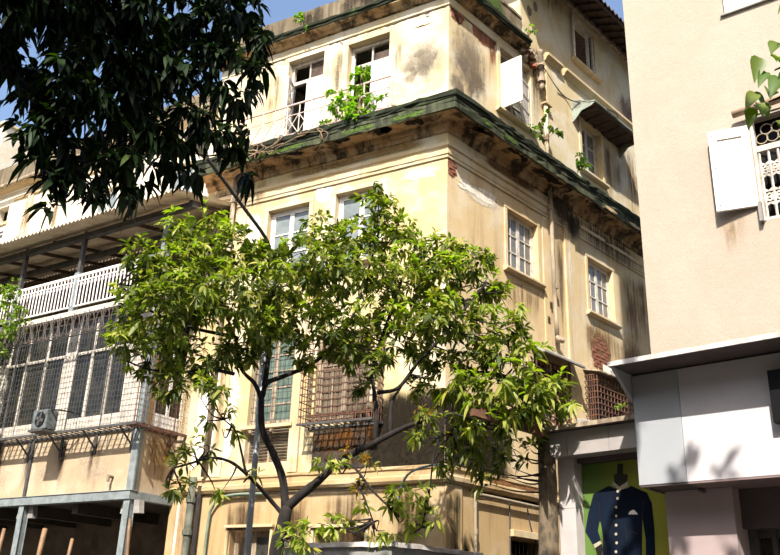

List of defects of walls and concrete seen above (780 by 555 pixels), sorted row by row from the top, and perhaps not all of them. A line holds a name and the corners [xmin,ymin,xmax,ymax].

spalling [450,2,464,25]
spalling [473,25,496,50]
damp [418,47,437,71]
damp [452,37,483,92]
damp [291,142,417,176]
peeling [404,158,496,209]
damp [487,159,534,191]
spalling [590,333,611,371]
damp [454,499,470,551]